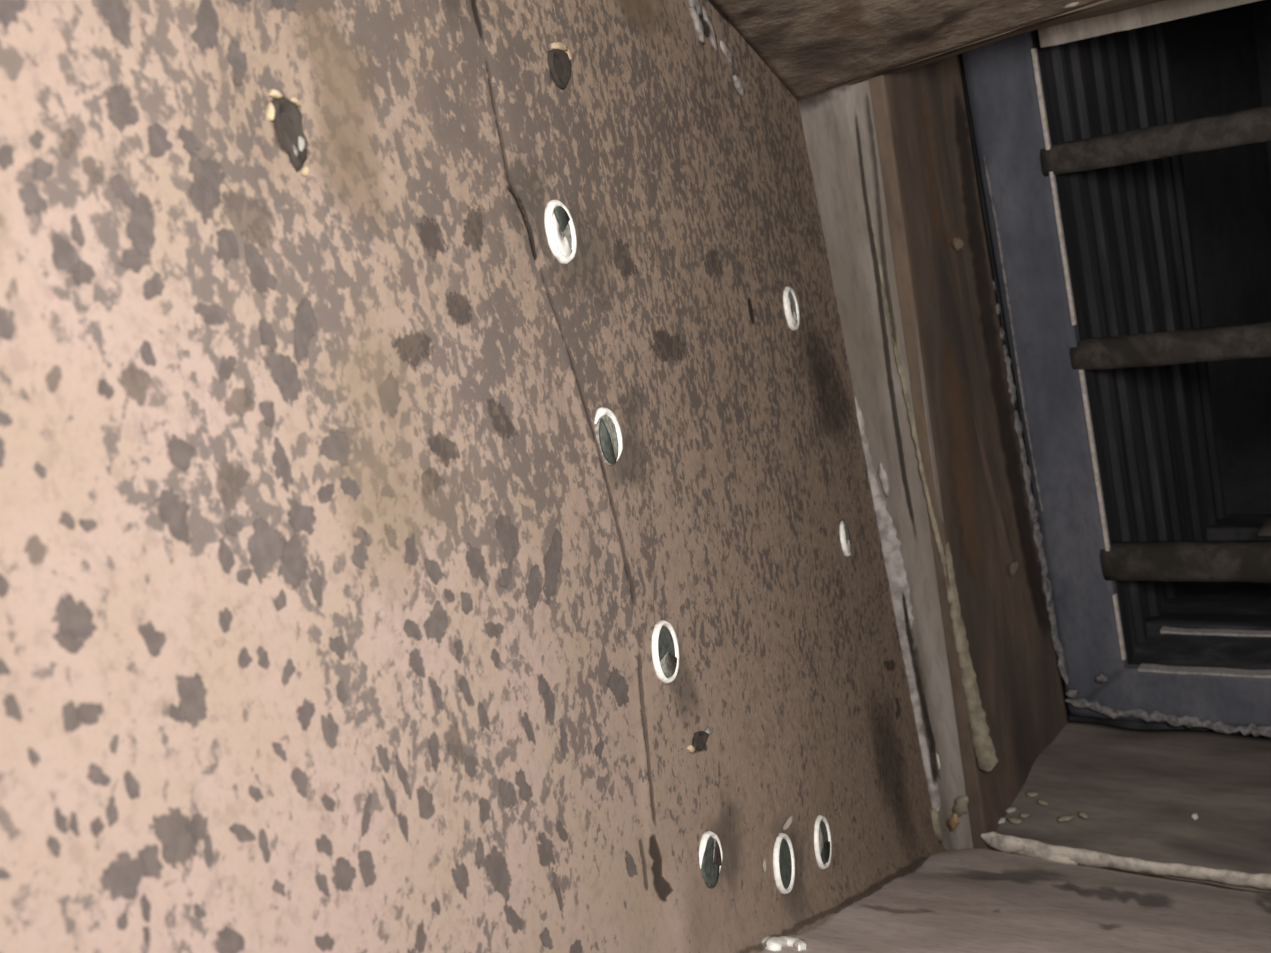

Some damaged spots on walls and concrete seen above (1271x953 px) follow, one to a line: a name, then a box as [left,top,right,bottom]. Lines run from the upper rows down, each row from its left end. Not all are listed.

leakage [19,128,165,300]
leakage [107,84,276,298]
leakage [98,340,157,406]
leakage [217,299,361,611]
crack [472,0,635,599]
leakage [47,763,140,858]
leakage [100,808,214,946]
leakage [169,673,207,727]
leakage [316,745,435,897]
leakage [384,523,490,731]
leakage [451,769,533,934]
crack [638,653,656,823]